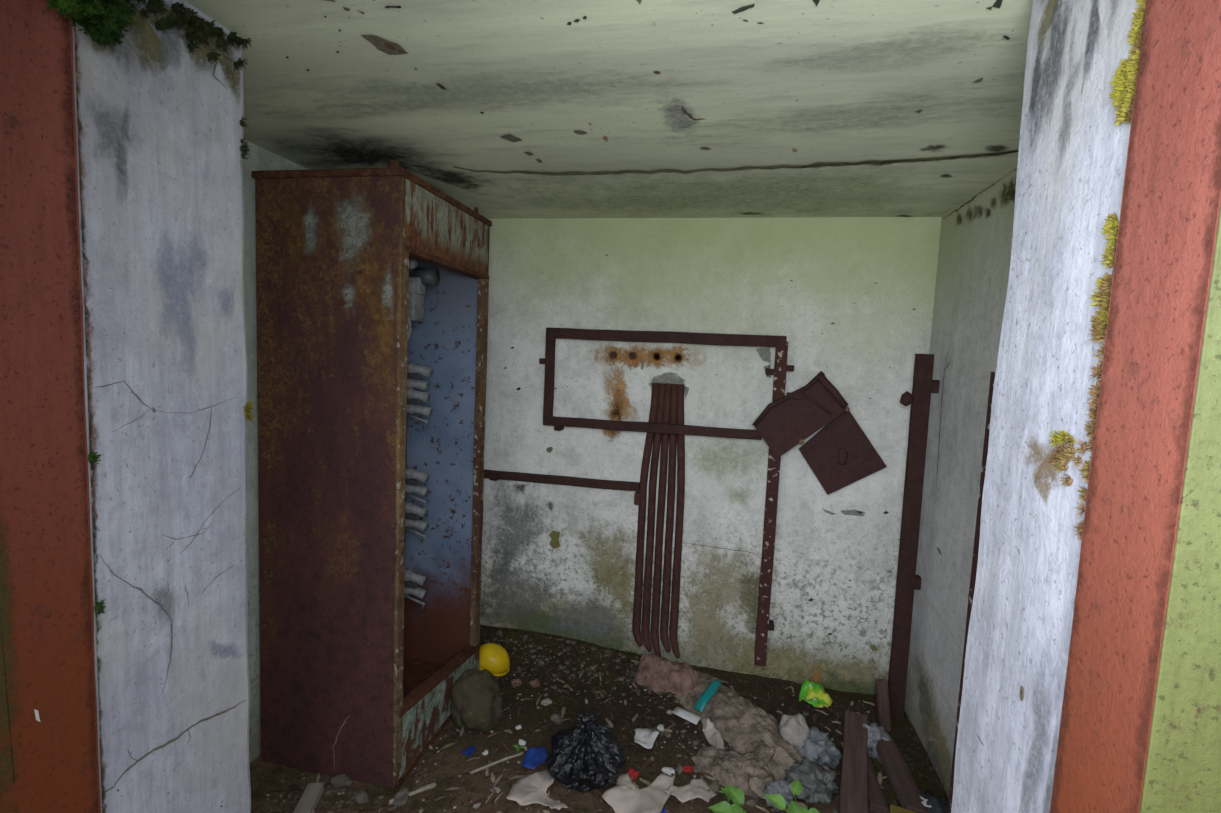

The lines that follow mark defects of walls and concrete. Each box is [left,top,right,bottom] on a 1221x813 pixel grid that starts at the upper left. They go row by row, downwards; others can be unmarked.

spalling [361,35,408,55]
damp [1030,6,1071,140]
damp [1076,0,1100,72]
mould [315,135,477,186]
crack [453,150,1019,175]
crack [75,43,246,812]
corrosion [595,346,686,438]
damp [491,485,634,645]